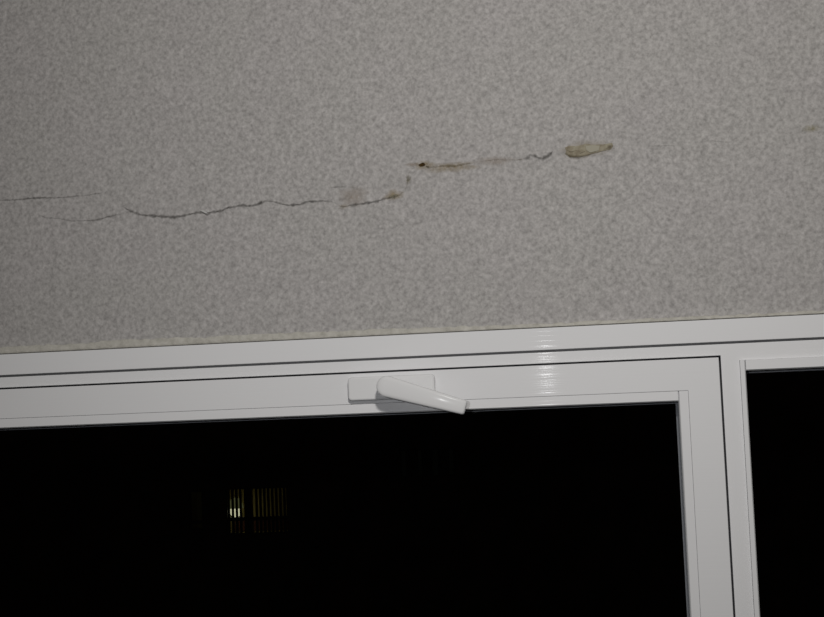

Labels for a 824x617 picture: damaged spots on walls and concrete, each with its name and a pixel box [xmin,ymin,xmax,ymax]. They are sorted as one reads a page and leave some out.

peeling [565,143,613,157]